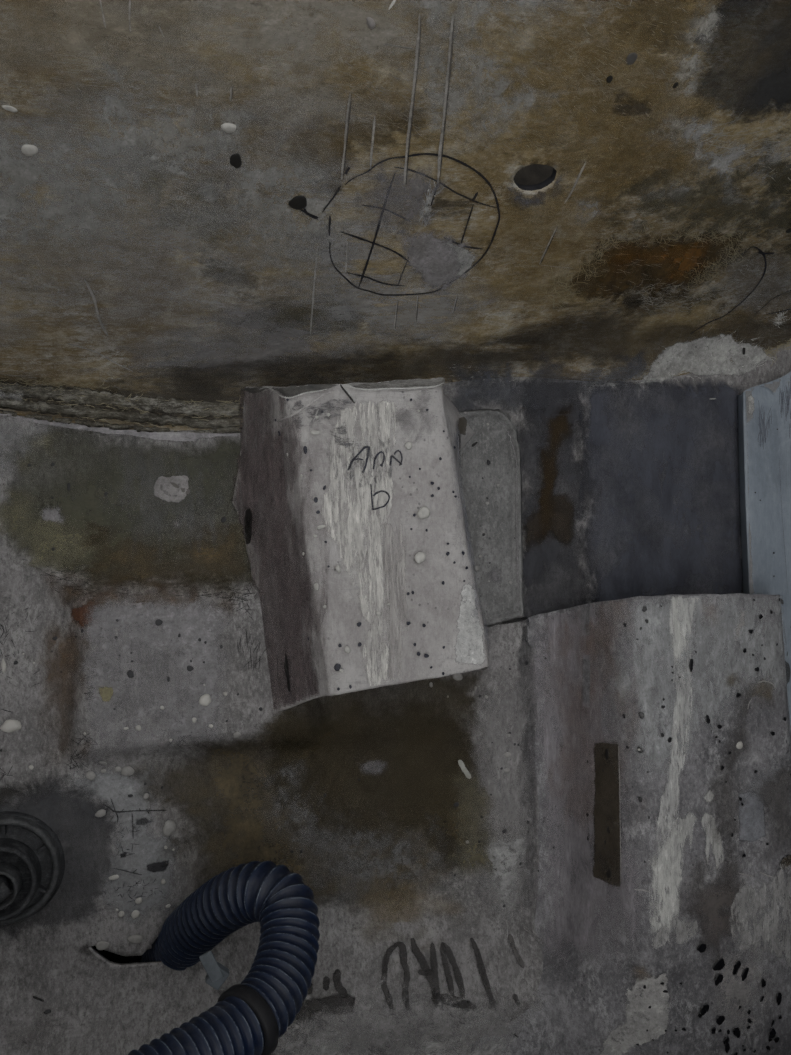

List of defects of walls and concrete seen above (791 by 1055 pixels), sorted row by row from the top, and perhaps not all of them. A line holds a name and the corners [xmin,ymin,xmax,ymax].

water stain [249,294,365,335]
peeling [580,329,791,389]
water stain [0,312,791,594]
water stain [139,675,496,904]
peeling [600,974,670,1055]